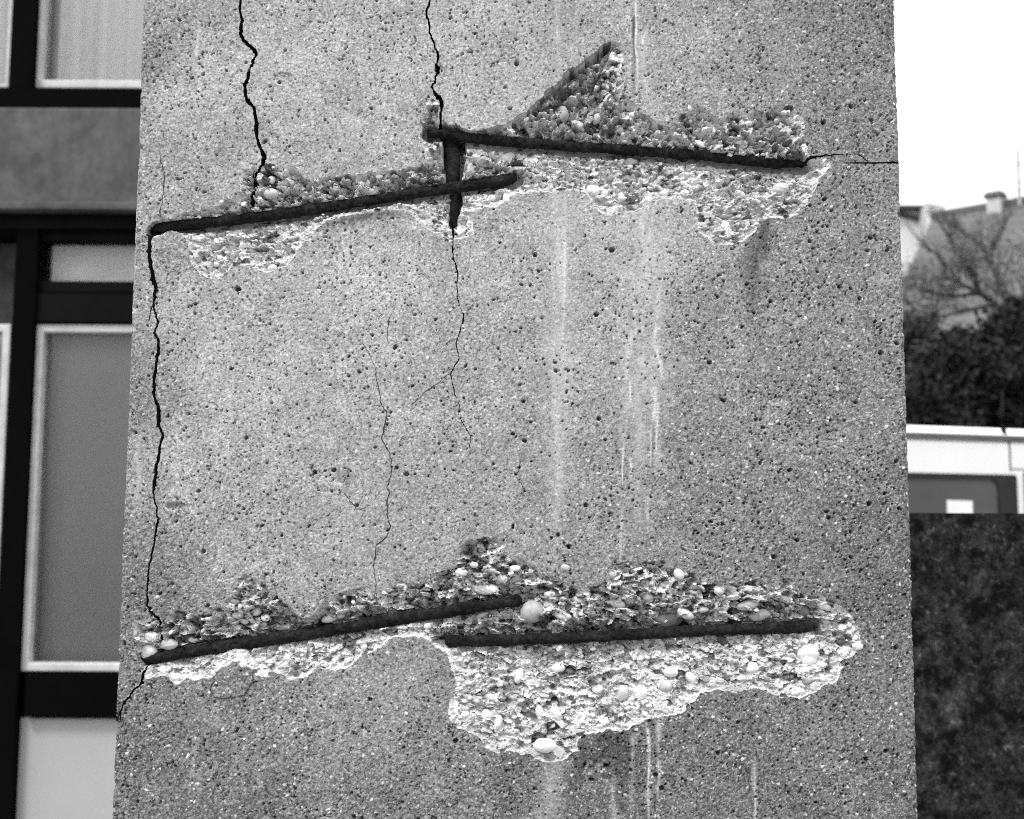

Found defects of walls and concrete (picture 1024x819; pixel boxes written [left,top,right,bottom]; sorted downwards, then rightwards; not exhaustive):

crack [238,0,267,207]
crack [425,0,445,145]
spalling [146,41,831,280]
crack [800,153,871,168]
crack [116,151,165,722]
crack [414,234,471,448]
spalling [132,537,863,762]